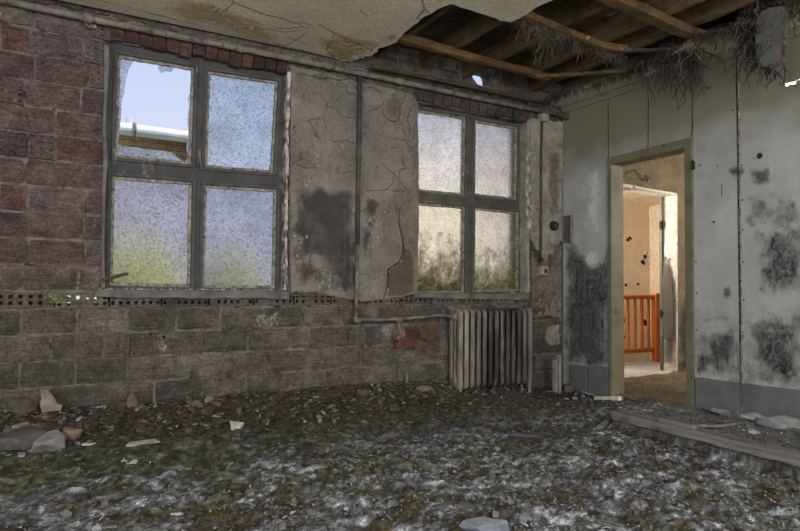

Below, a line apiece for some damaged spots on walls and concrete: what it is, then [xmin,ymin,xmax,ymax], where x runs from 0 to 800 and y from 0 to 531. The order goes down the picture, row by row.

spalling [328,41,378,62]